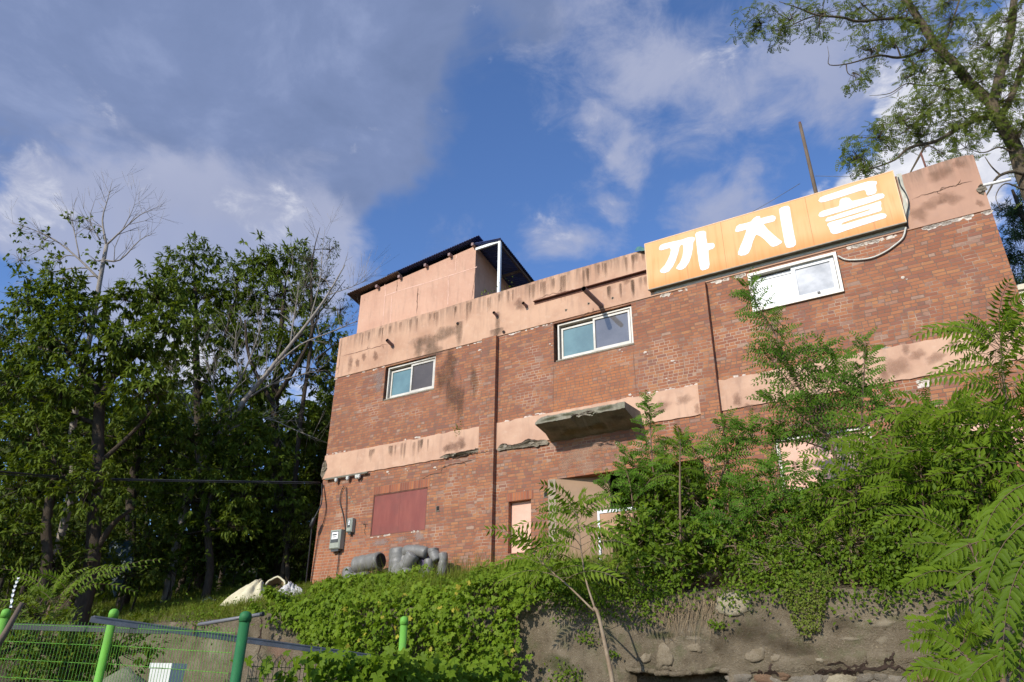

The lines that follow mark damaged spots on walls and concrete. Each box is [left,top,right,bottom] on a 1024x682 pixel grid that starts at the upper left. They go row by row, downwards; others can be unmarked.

spalling [497,439,549,451]
spalling [440,448,478,458]